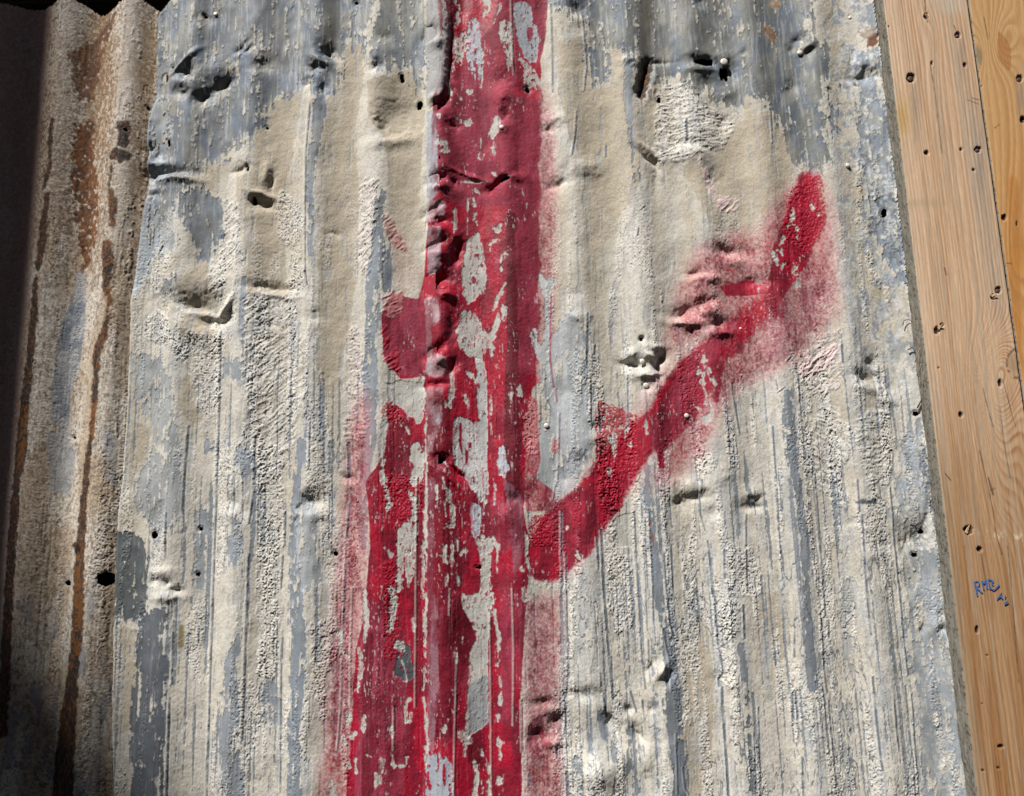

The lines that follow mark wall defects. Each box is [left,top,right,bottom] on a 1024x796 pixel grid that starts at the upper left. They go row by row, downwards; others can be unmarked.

rust [67,8,120,104]
peeling [339,0,542,102]
peeling [477,115,502,161]
peeling [51,0,324,428]
peeling [508,384,524,401]
rust [52,120,134,796]
peeling [362,171,511,796]
peeling [607,419,649,477]
peeling [100,352,247,796]
peeling [258,517,322,796]
peeling [334,588,371,693]
peeling [341,711,410,790]